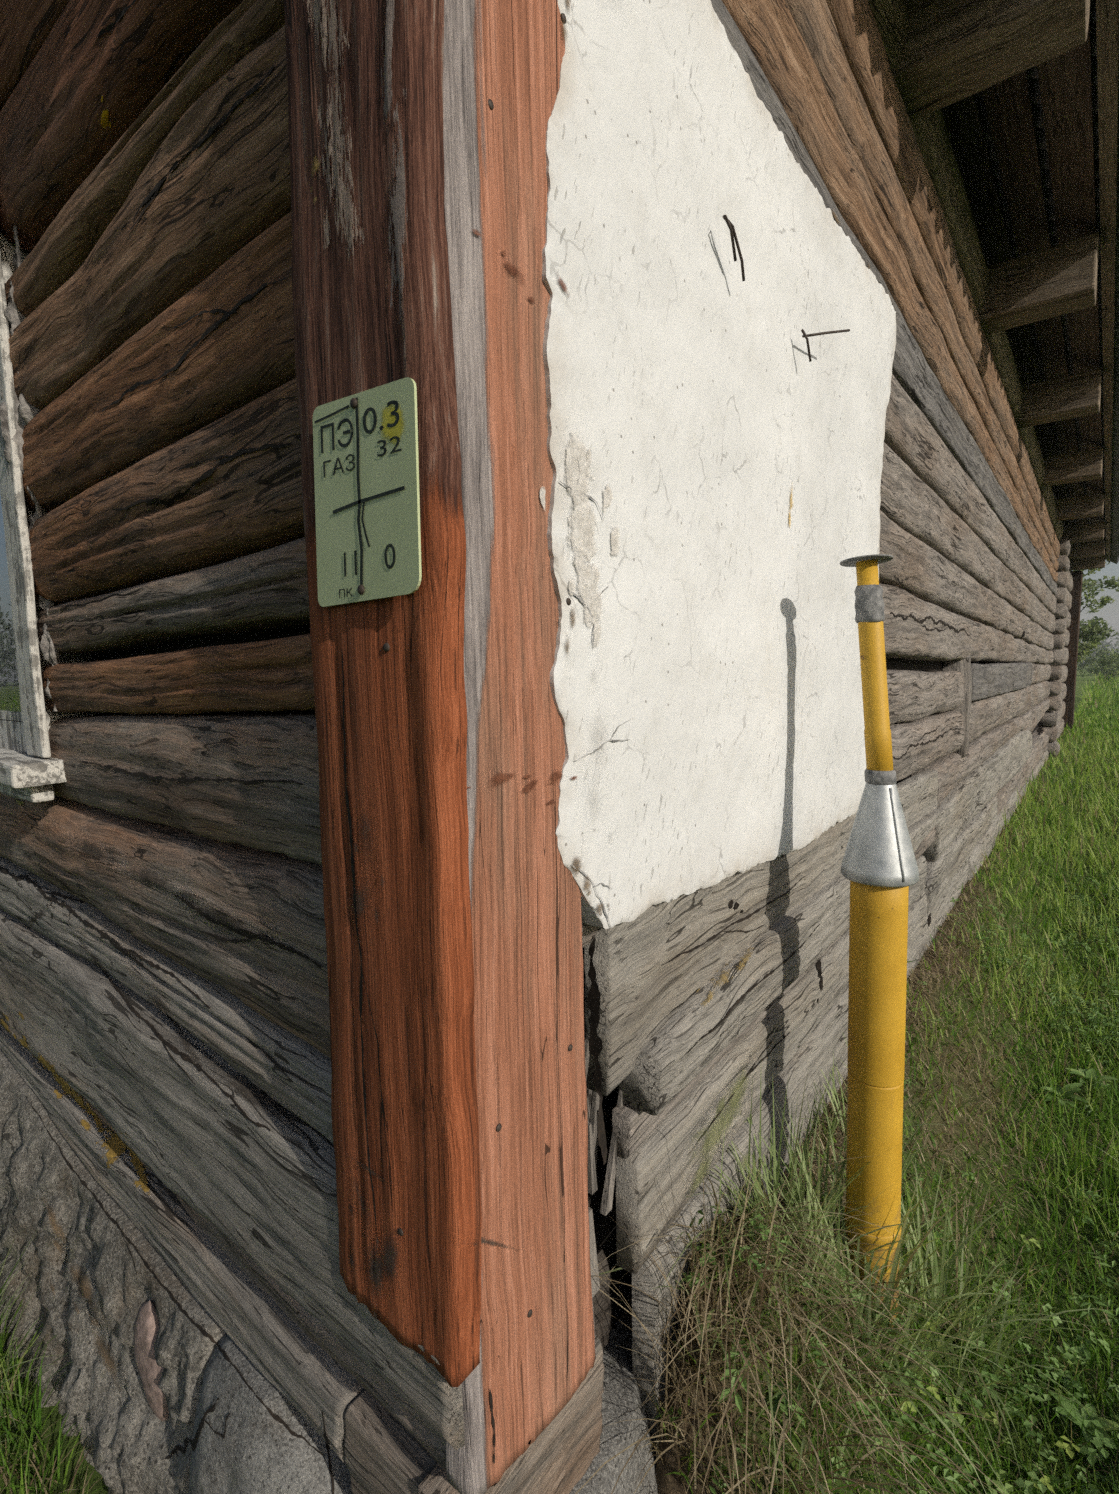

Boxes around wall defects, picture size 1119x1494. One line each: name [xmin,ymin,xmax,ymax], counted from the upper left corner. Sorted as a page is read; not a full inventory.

peeling [558,431,620,647]
spalling [573,859,610,915]
crack [26,1097,334,1494]